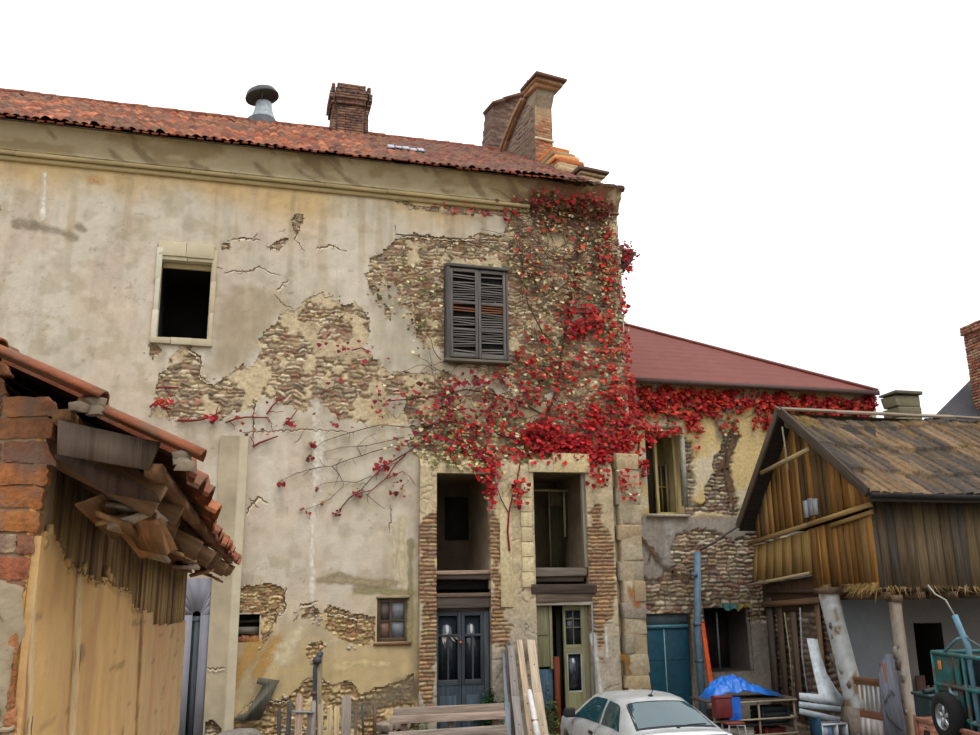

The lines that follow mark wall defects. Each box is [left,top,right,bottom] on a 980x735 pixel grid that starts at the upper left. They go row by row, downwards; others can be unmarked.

crack [231,232,260,242]
crack [284,229,347,253]
crack [219,265,293,309]
spalling [143,201,629,492]
spalling [239,583,375,664]
spalling [205,673,415,735]